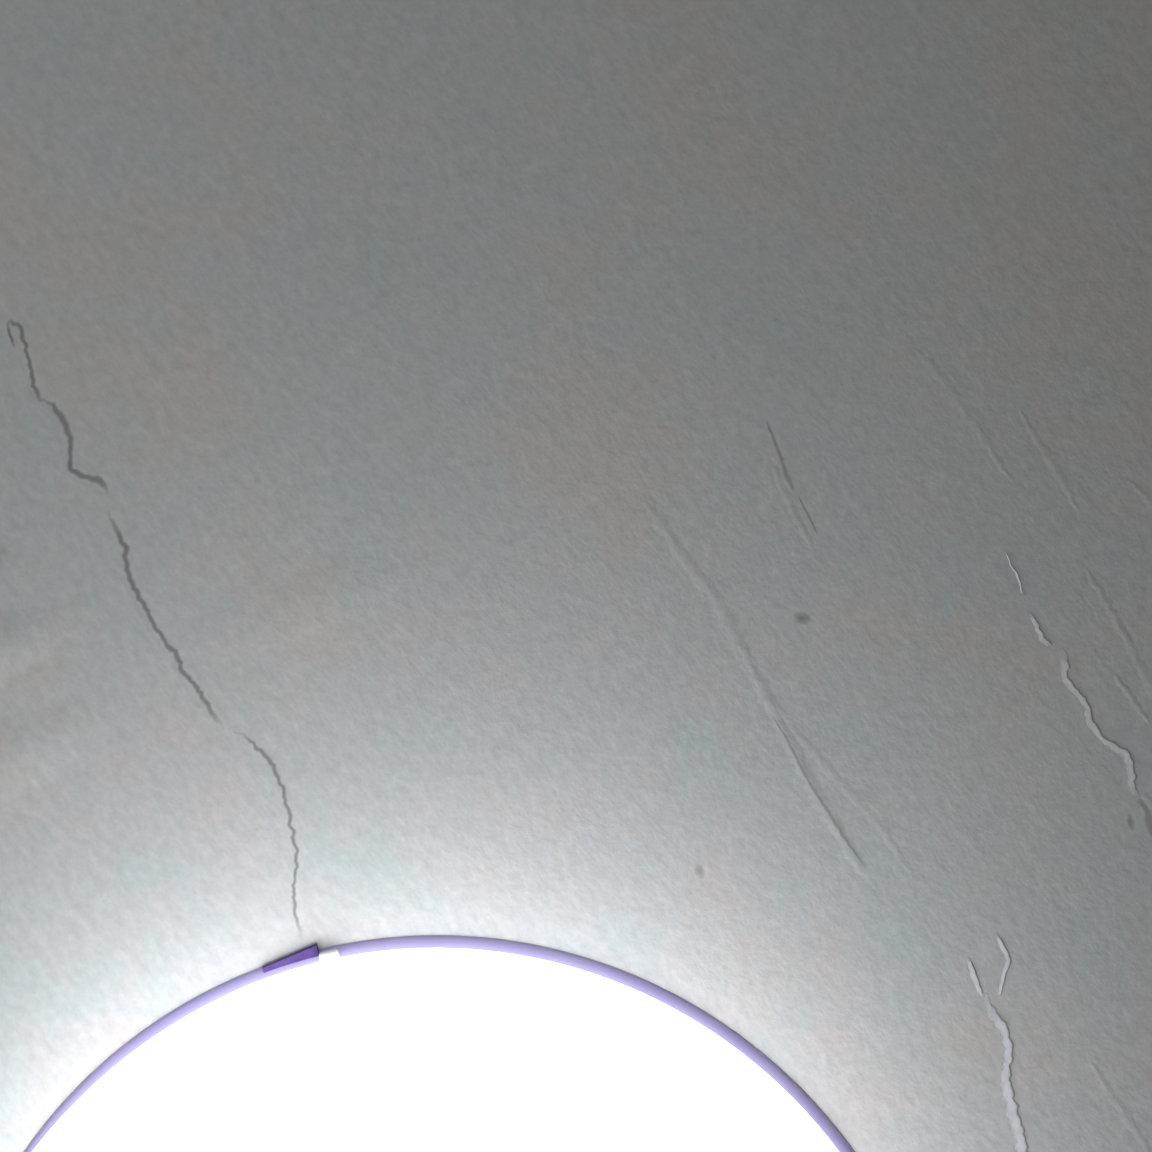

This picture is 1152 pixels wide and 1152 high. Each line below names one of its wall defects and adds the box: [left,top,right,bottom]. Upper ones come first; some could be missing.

crack [1006,554,1152,812]
crack [968,936,1028,1152]